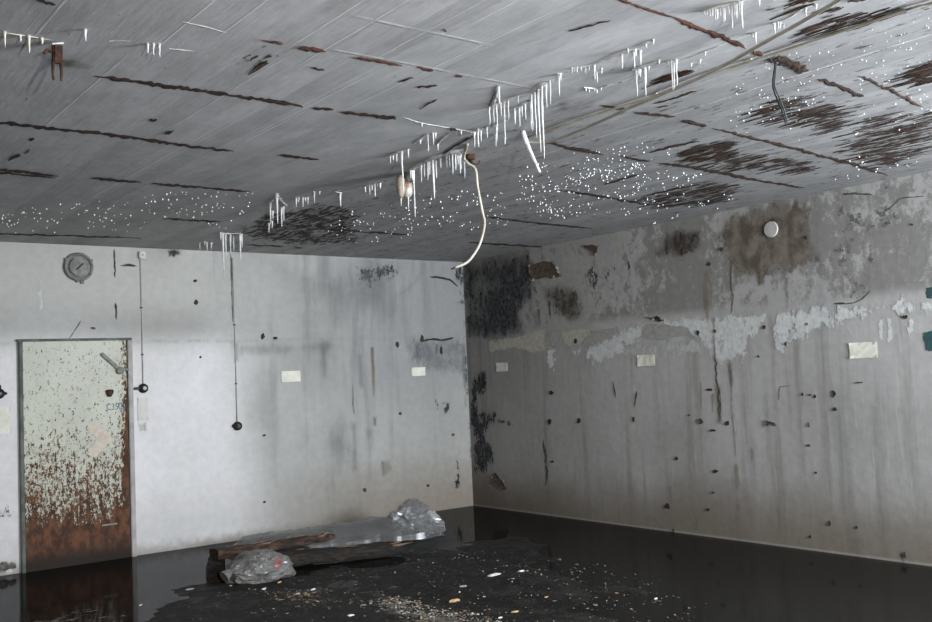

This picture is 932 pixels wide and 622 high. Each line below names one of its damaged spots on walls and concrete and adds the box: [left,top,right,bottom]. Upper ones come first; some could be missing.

leakage [702,0,757,43]
leakage [758,0,818,33]
leakage [387,39,718,217]
leakage [455,250,583,345]
flaking render [528,261,562,281]
peeling [572,293,932,364]
leakage [721,201,818,286]
leakage [463,355,511,477]
flaking render [0,560,20,574]